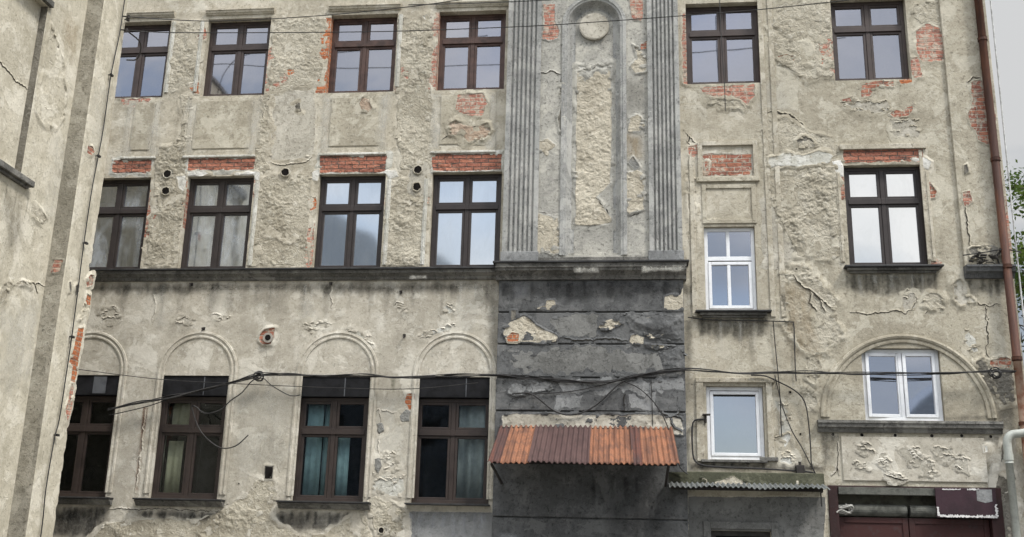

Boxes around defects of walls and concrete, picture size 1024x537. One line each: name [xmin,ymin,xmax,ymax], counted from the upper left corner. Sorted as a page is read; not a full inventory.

crack [0,39,65,120]
spalling [108,8,505,268]
spalling [537,57,648,257]
flaking render [966,78,1000,148]
crack [2,279,45,293]
flaking render [47,257,124,428]
flaking render [401,389,412,414]
peeling [498,298,685,437]
spalling [678,0,945,489]
crack [793,274,1001,383]
spalling [85,448,412,537]